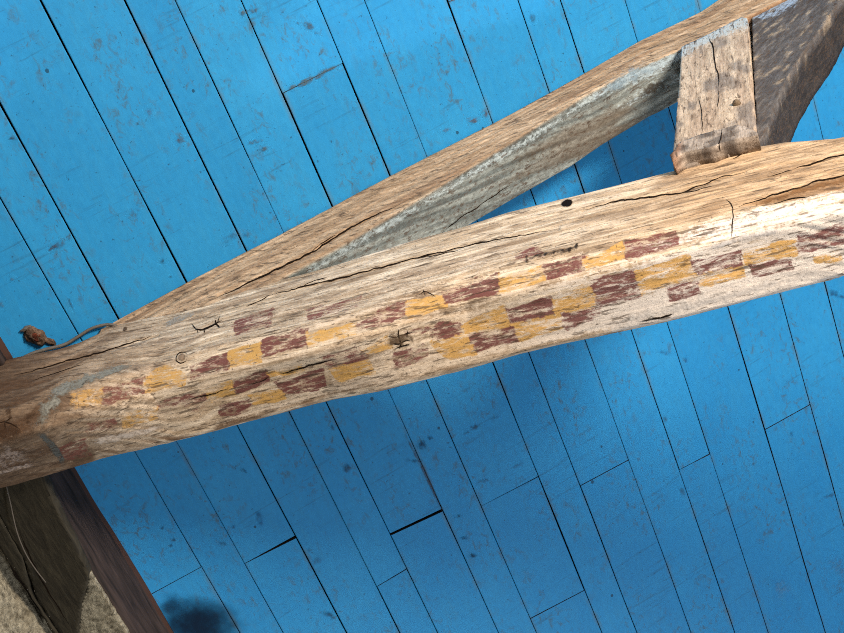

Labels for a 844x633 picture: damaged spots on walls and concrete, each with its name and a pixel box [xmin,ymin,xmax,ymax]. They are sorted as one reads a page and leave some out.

crack [772,154,844,176]
crack [192,184,554,333]
crack [16,337,148,380]